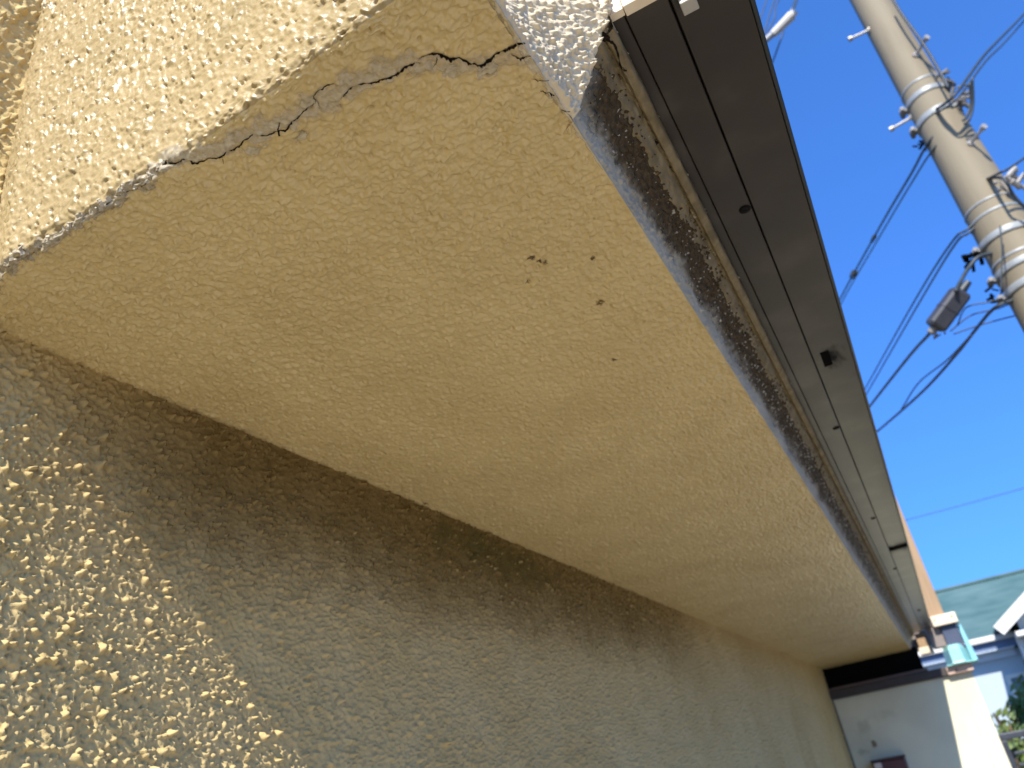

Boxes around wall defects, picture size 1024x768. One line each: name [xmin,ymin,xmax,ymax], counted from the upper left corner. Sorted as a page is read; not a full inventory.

crack [162,42,570,166]
damp [590,66,890,603]